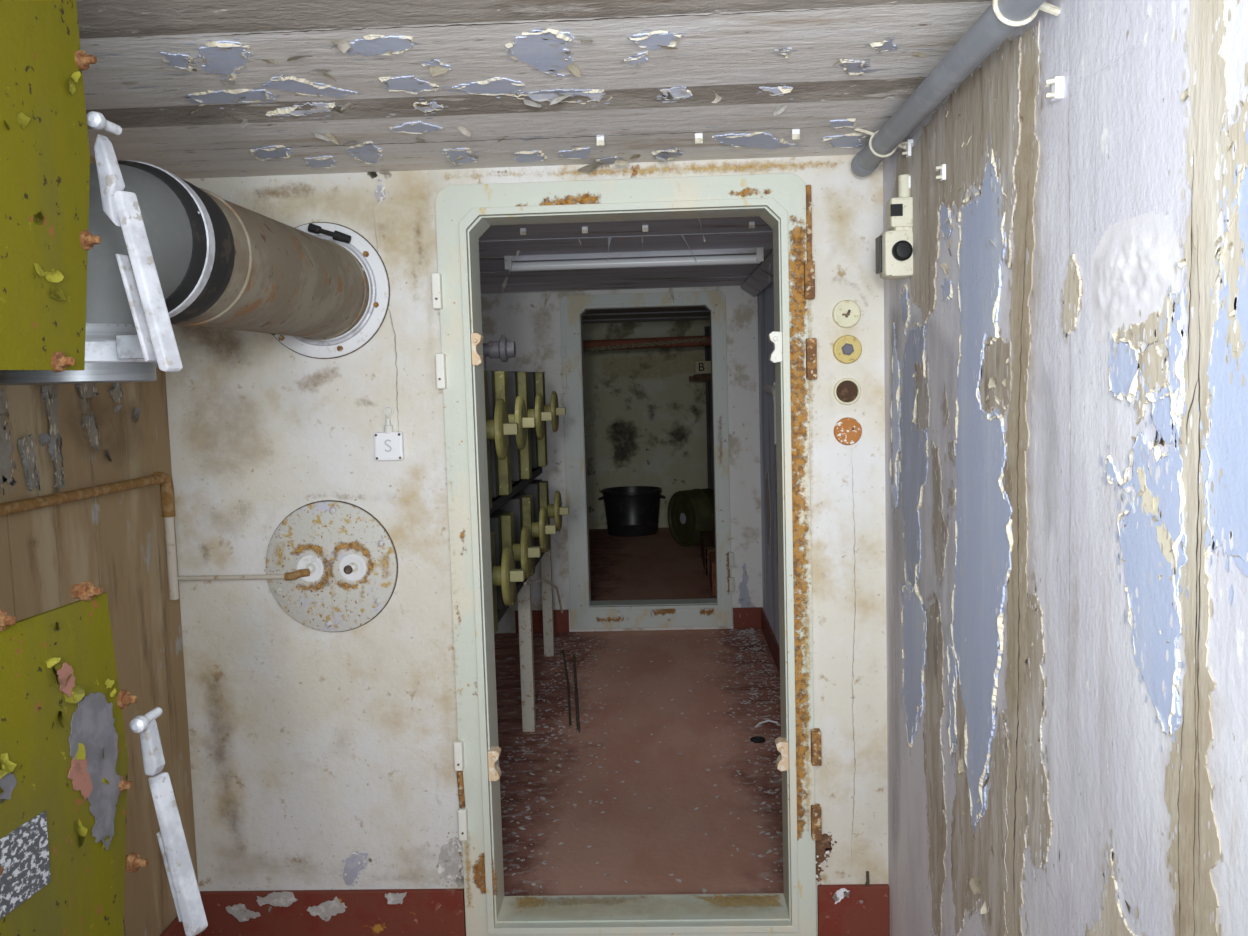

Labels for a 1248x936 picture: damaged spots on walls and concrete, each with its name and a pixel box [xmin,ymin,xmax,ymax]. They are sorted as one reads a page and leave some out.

peeling [160,39,396,205]
peeling [369,29,612,166]
rust [516,194,600,206]
peeling [513,147,684,172]
flaking render [1061,254,1083,343]
water stain [611,422,636,460]
peeling [889,20,1060,936]
flaking render [1100,0,1248,936]
rust [784,215,837,885]
flaking render [226,851,372,923]
flaking render [832,888,863,904]
flaking render [1075,829,1144,936]